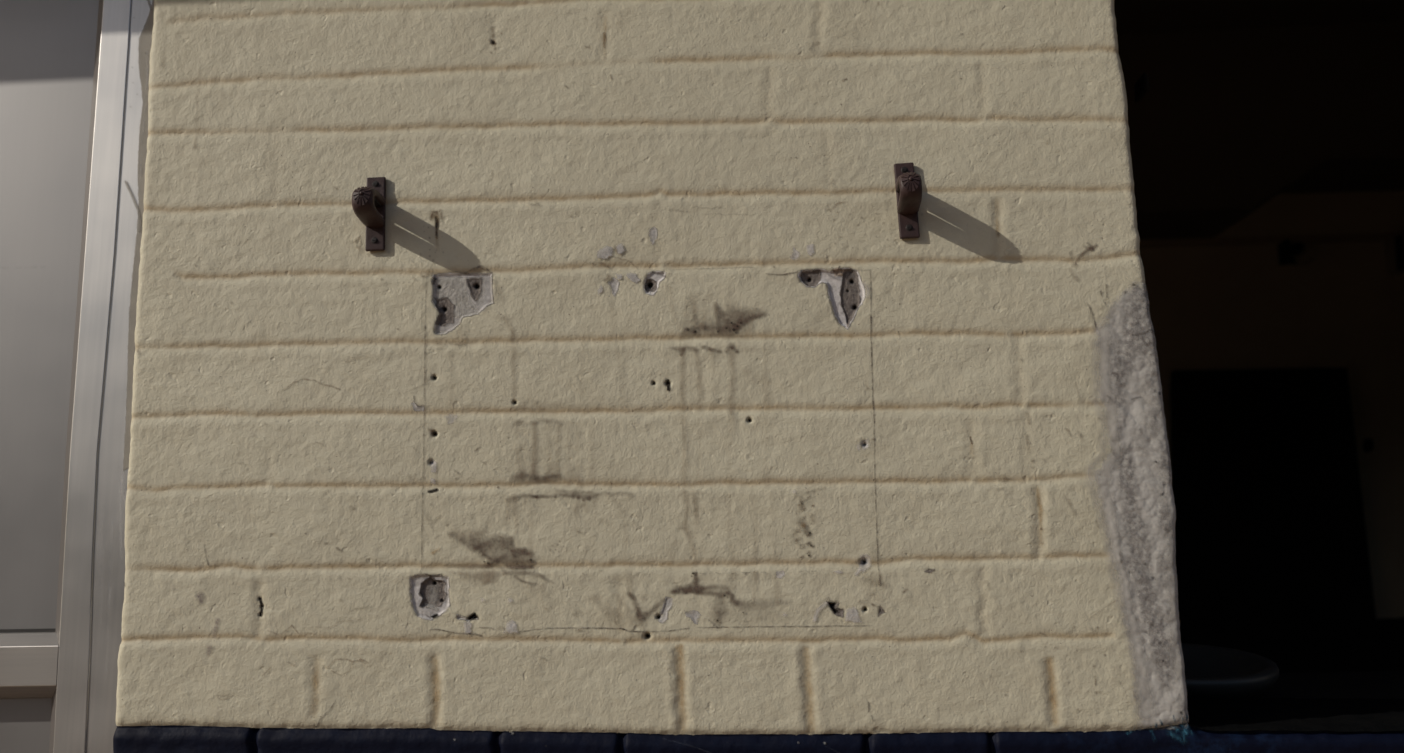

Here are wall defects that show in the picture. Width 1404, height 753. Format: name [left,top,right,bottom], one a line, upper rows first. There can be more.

spalling [432,266,493,335]
spalling [798,266,868,329]
spalling [410,574,478,633]